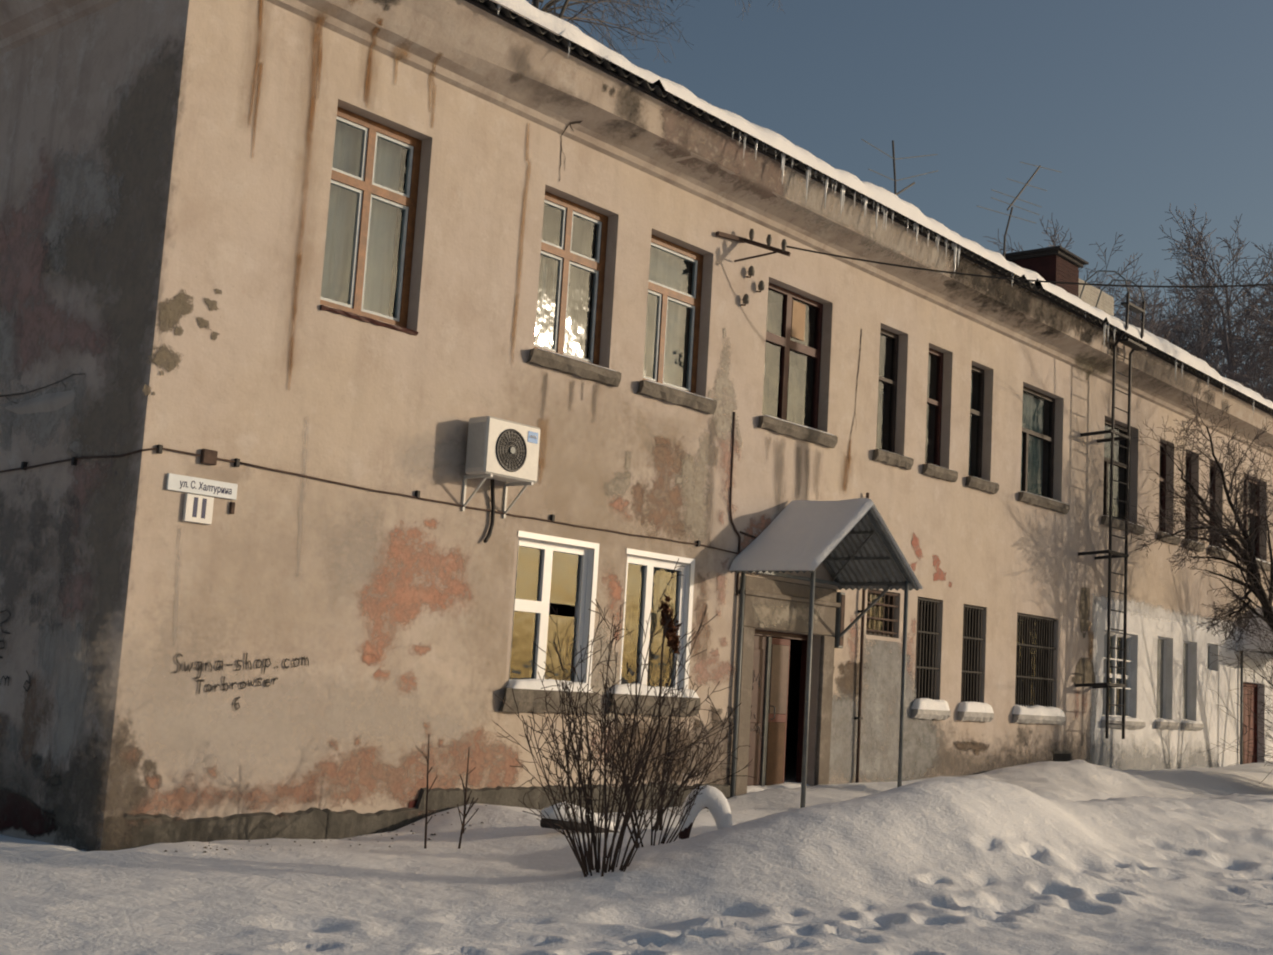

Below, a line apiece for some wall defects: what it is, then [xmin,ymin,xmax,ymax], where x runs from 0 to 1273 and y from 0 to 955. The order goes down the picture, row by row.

corrosion [250,46,262,144]
corrosion [307,16,323,144]
corrosion [365,19,382,100]
damp [603,85,644,137]
corrosion [518,127,530,287]
flaking render [147,289,222,375]
damp [0,43,185,745]
peeling [605,436,689,537]
peeling [361,520,471,690]
peeling [911,534,951,587]
peeling [0,723,522,851]